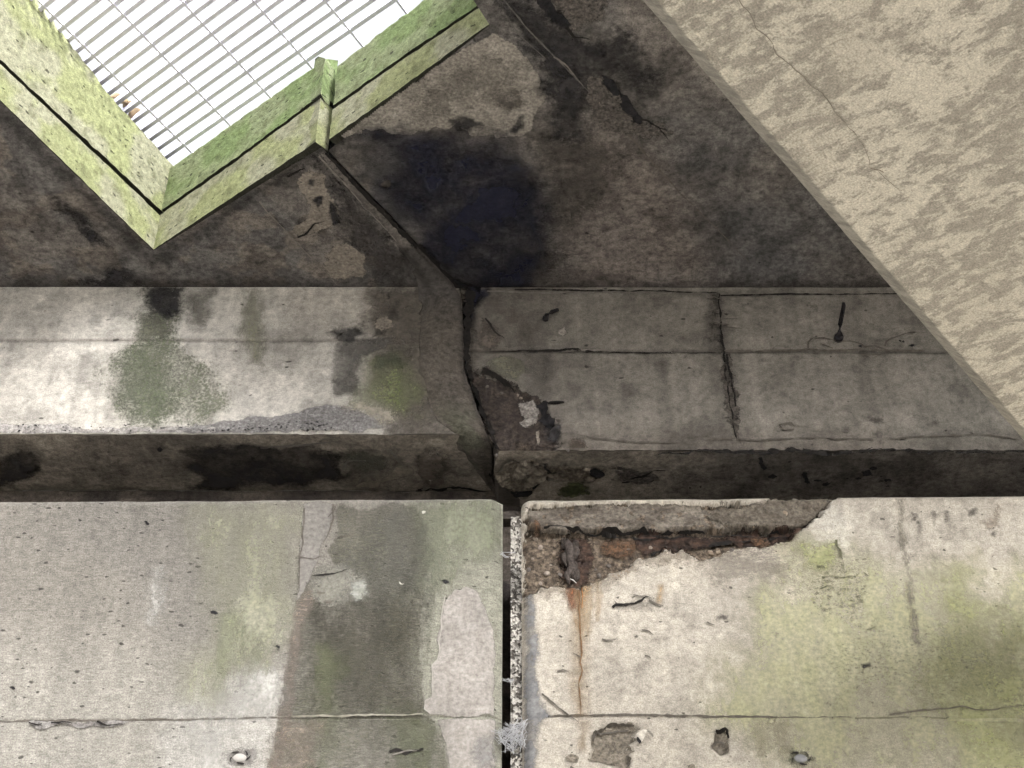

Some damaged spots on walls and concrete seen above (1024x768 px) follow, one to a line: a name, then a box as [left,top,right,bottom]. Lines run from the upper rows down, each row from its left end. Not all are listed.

leakage [366,128,625,287]
leakage [184,291,212,327]
leakage [118,314,185,424]
leakage [0,452,38,487]
leakage [183,441,413,490]
spalling [467,294,1024,605]
spalling [565,722,653,768]